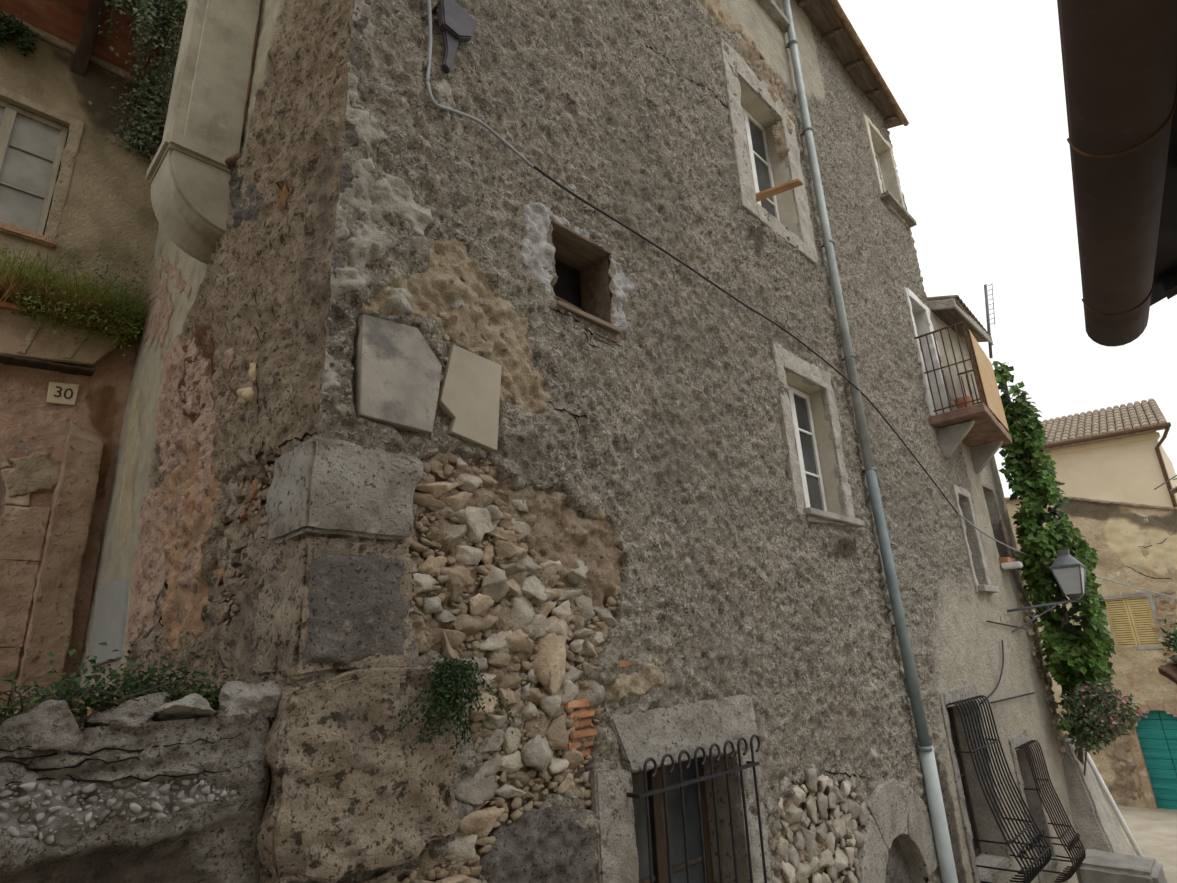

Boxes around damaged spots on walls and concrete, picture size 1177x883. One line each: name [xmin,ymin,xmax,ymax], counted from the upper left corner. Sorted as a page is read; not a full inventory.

flaking render [327,0,550,414]
spalling [321,351,346,393]
crack [0,717,272,811]